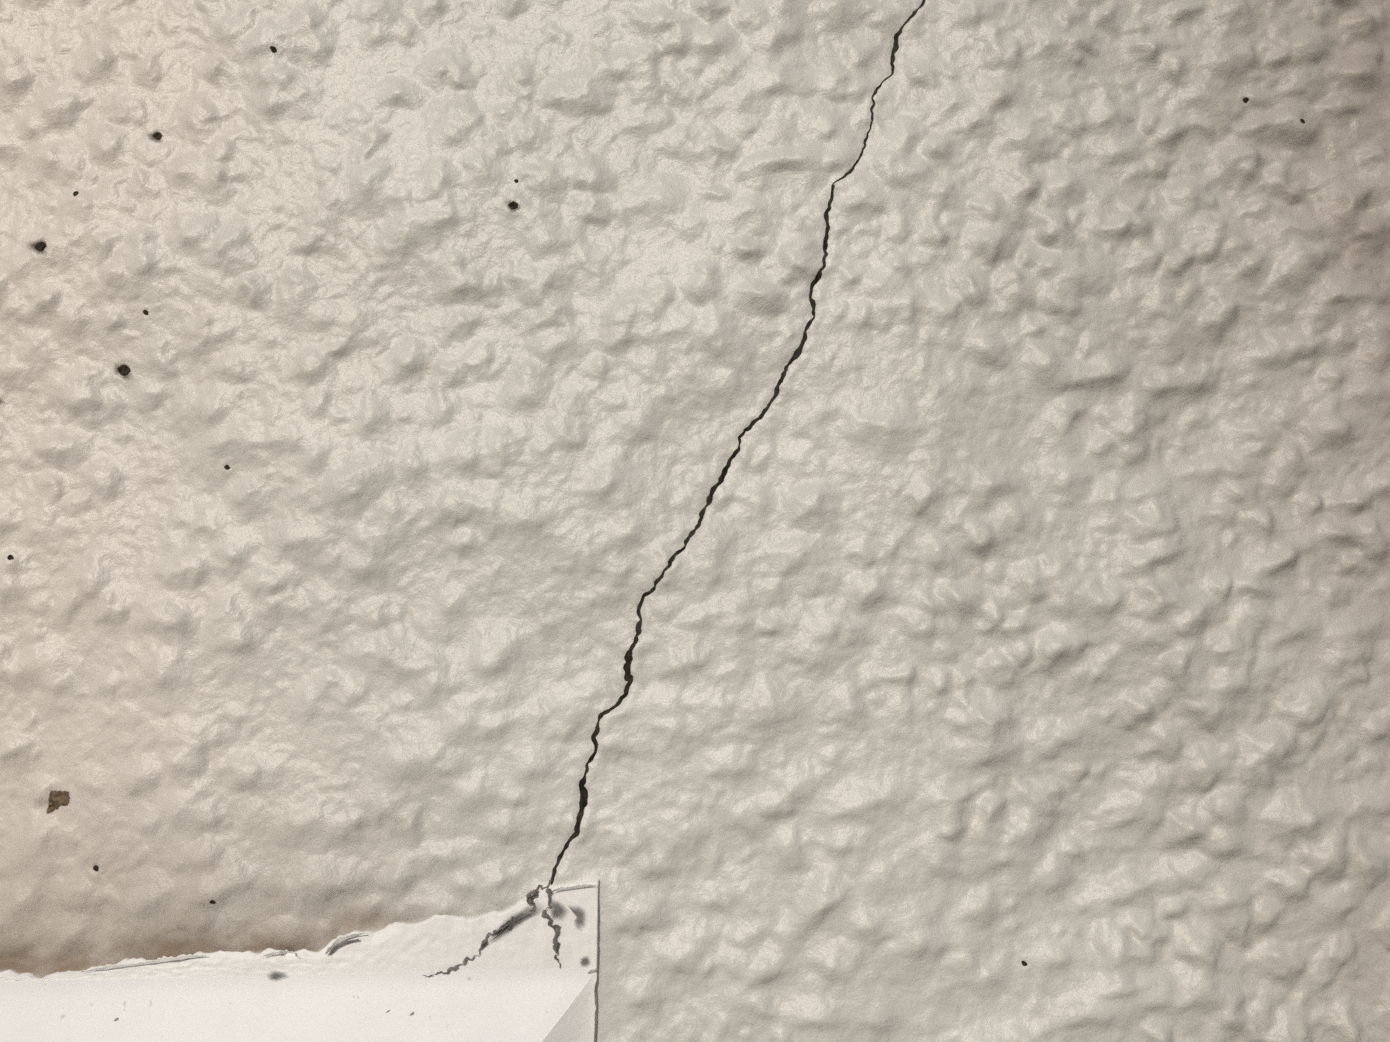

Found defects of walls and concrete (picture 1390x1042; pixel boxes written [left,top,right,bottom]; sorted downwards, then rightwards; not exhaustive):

crack [423,0,925,977]
peeling [552,884,596,924]
peeling [496,909,533,937]
peeling [325,933,365,955]
peeling [81,954,206,973]
peeling [264,949,297,979]